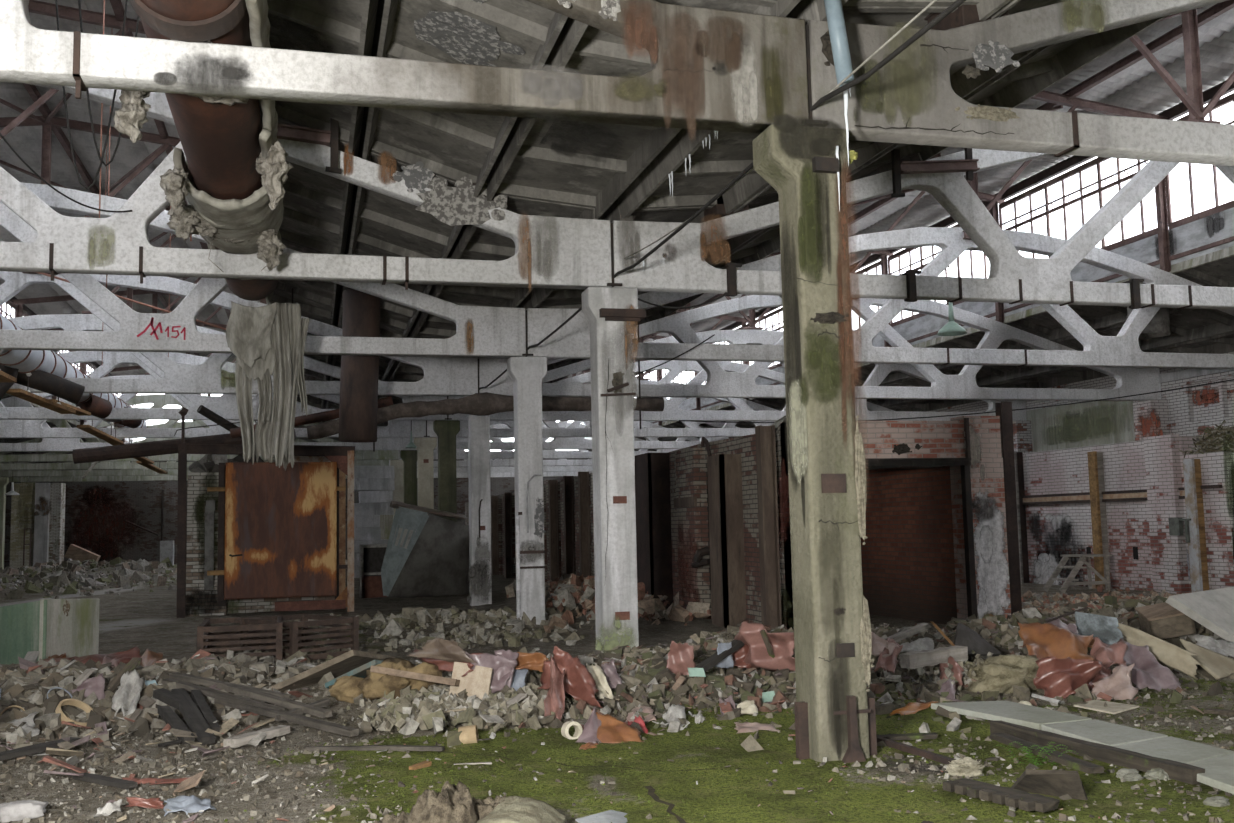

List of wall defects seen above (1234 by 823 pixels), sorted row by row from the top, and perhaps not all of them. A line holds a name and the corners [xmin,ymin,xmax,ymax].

leakage [155,58,249,93]
peeling [393,161,508,226]
corrosion [520,217,531,290]
corrosion [700,218,730,263]
leakage [781,178,830,524]
crack [619,766,771,823]